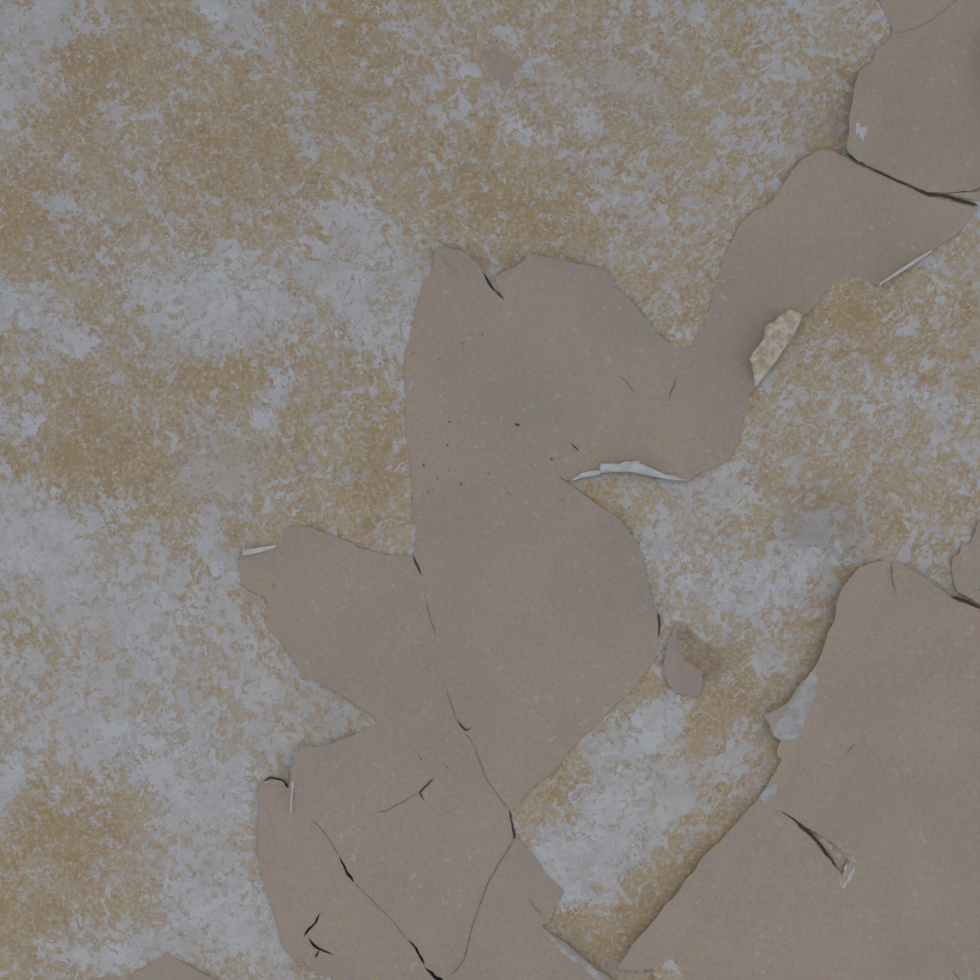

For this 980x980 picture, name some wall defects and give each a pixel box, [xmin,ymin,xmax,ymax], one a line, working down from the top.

peeling [238,0,980,980]
crack [311,686,515,980]
crack [781,811,837,868]
crack [304,912,333,959]
peeling [91,952,217,980]